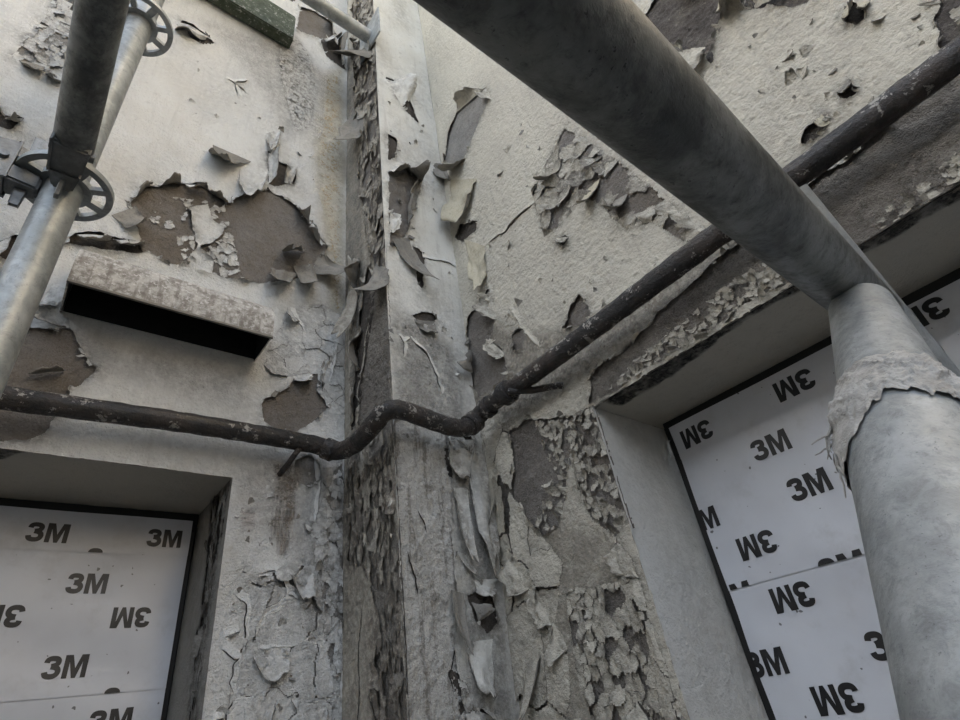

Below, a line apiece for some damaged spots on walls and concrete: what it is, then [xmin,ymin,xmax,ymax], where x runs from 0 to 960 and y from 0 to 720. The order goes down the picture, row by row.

peeling [13,0,72,83]
peeling [646,0,809,69]
peeling [841,0,886,25]
peeling [910,0,960,48]
peeling [0,107,24,129]
peeling [65,0,525,431]
peeling [525,128,704,246]
peeling [801,75,960,247]
peeling [6,283,96,395]
peeling [216,240,797,720]
peeling [186,481,255,720]
crack [212,563,317,720]